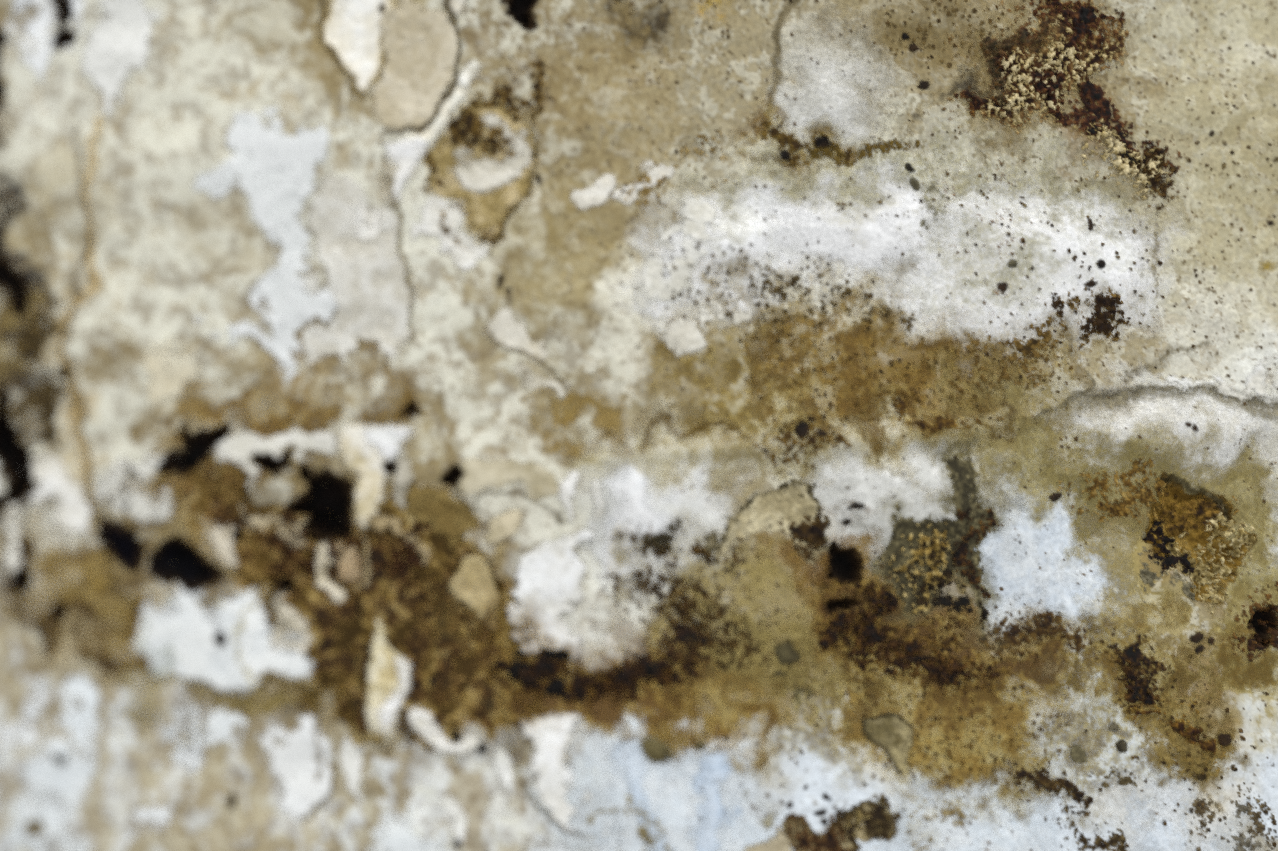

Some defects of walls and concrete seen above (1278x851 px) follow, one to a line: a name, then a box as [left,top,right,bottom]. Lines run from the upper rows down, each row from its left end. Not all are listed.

peeling [6,0,161,115]
peeling [192,0,550,382]
water stain [359,366,422,425]
crack [1043,347,1278,418]
water stain [520,280,1278,851]
flaking render [5,428,671,851]
water stain [477,725,532,758]